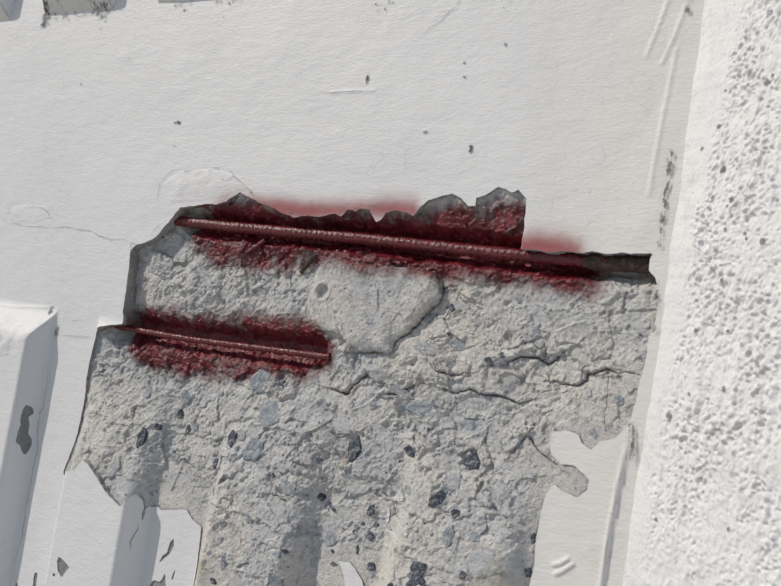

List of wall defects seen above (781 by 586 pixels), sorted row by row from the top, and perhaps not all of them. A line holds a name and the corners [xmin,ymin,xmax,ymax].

spalling [64,188,658,586]
peeling [16,405,34,454]
peeling [53,557,69,576]